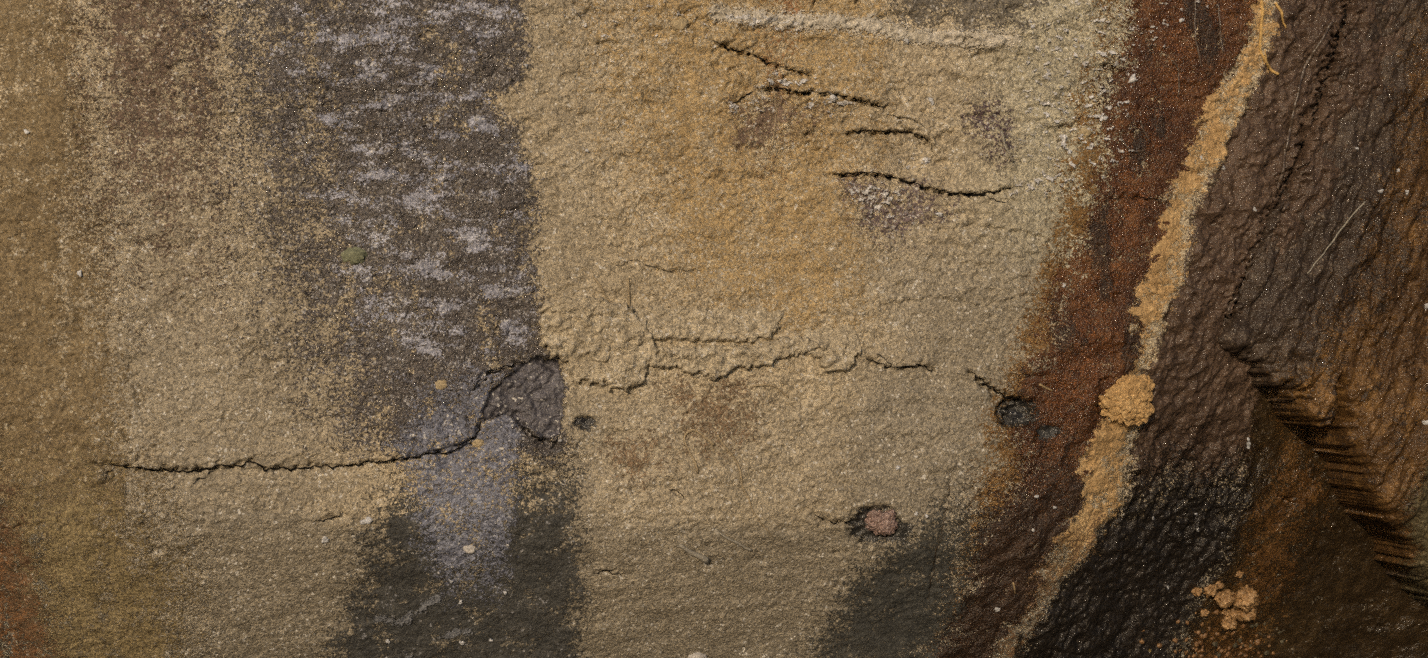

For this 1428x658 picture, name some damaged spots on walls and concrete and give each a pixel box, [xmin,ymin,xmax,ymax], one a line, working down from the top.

damp [552,0,1169,356]
crack [713,40,1011,203]
damp [0,0,597,658]
crack [91,362,559,488]
peeling [481,295,865,443]
damp [597,367,775,497]